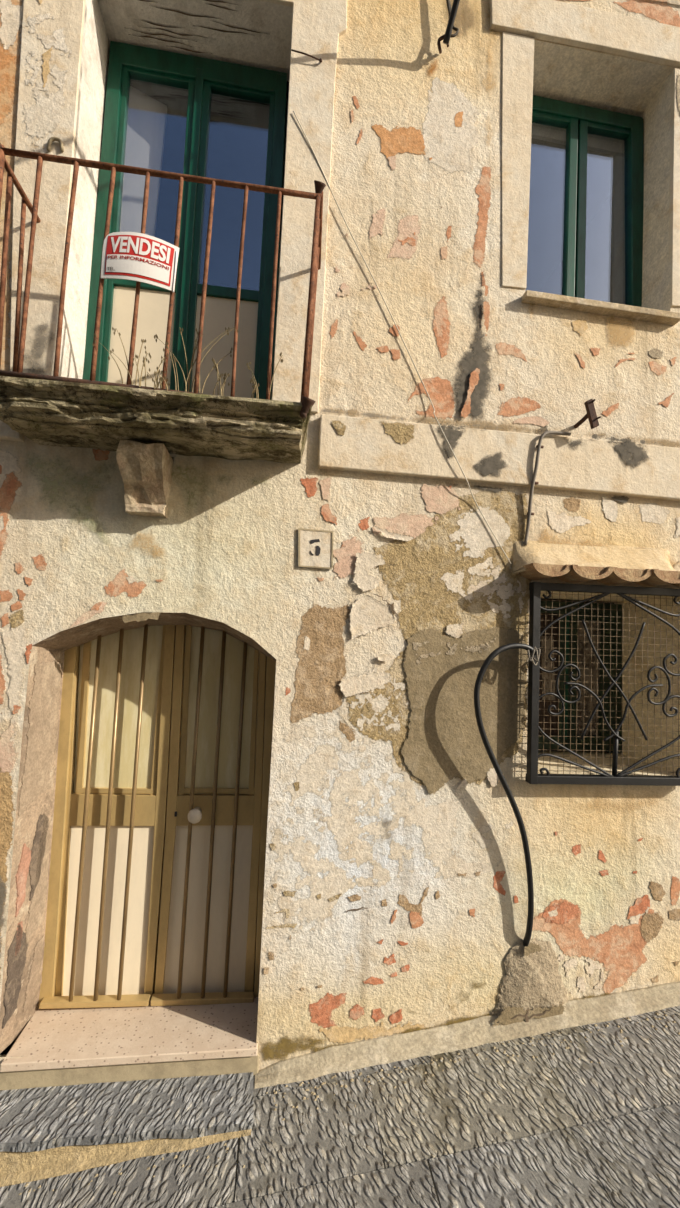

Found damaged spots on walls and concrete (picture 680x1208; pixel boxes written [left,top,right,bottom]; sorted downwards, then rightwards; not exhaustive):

peeling [0,0,72,371]
peeling [351,96,432,170]
water stain [321,277,543,458]
peeling [0,449,22,558]
peeling [547,497,591,533]
peeling [602,496,619,522]
peeling [638,503,680,538]
spalling [266,477,531,940]
peeling [0,554,62,1029]
peeling [301,985,426,1044]
peeling [363,939,410,985]
peeling [493,876,680,1026]